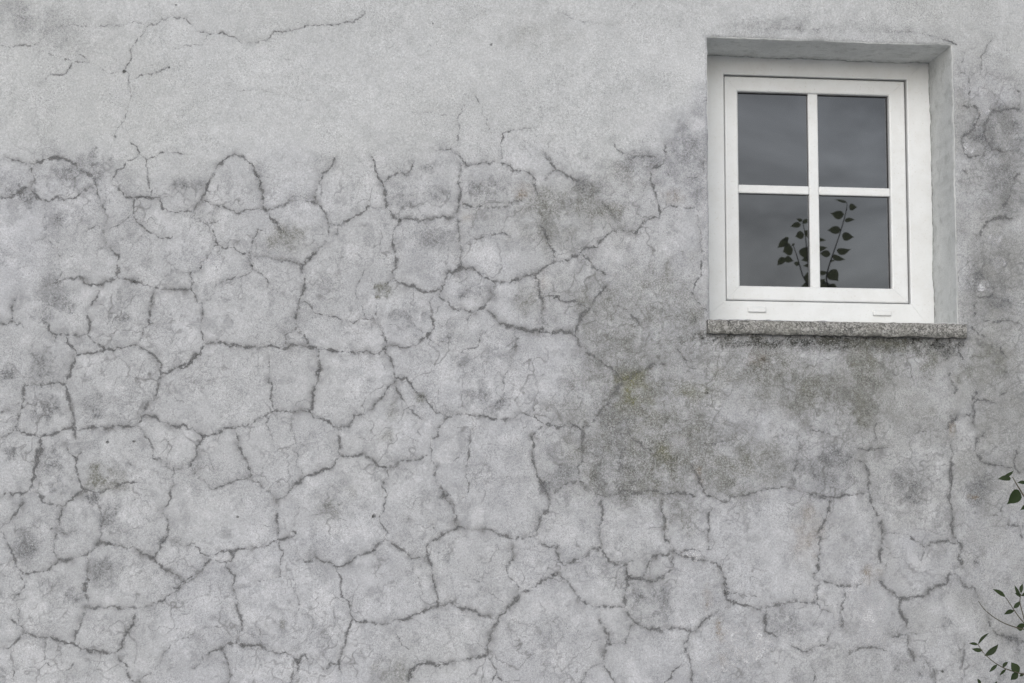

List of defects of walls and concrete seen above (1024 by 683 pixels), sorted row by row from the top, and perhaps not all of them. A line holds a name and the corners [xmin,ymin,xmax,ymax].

crack [963,91,1019,158]
crack [1,131,975,683]
crack [948,351,1018,472]